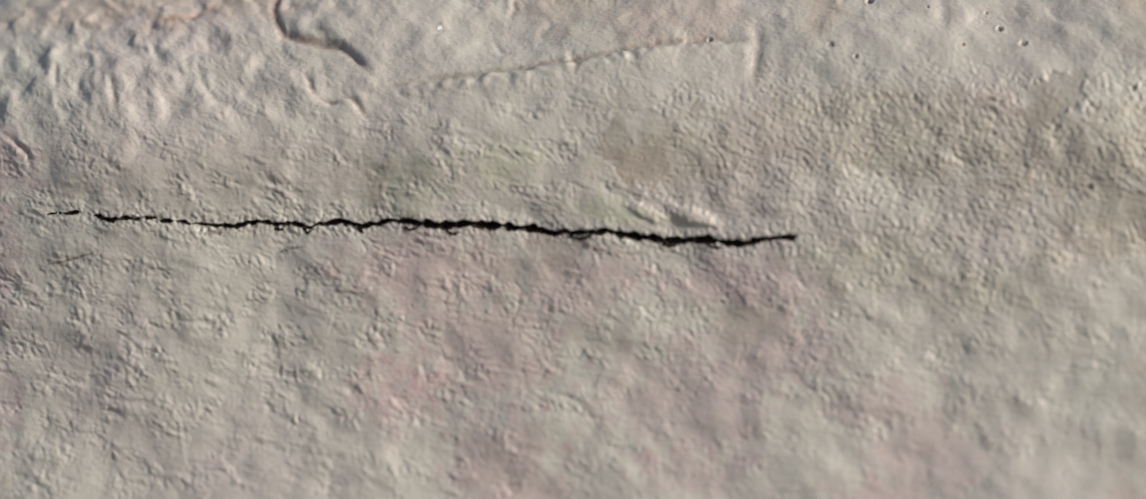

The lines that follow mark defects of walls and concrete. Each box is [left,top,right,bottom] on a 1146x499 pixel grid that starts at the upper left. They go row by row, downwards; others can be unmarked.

crack [47,210,796,253]
crack [46,253,92,265]